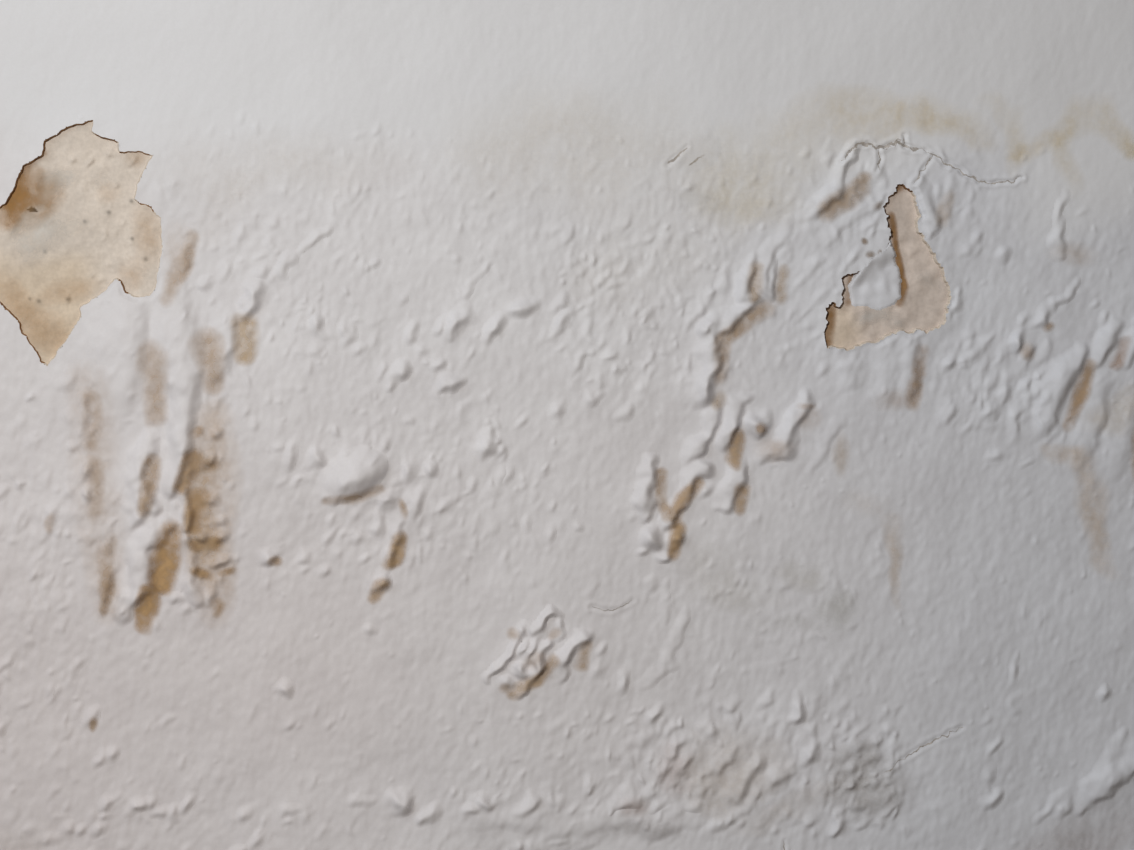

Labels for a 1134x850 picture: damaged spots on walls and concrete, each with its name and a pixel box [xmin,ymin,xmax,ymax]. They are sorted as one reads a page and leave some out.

peeling [0,120,163,366]
peeling [824,184,952,351]
crack [841,136,1016,184]